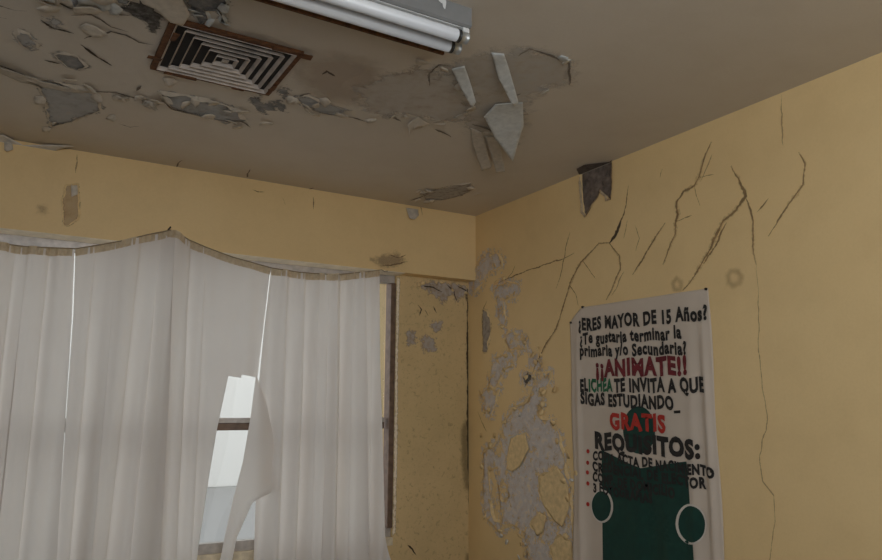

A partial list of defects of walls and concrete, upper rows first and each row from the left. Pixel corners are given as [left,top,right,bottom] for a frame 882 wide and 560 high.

peeling [35,0,140,38]
peeling [184,0,231,27]
peeling [0,51,363,132]
peeling [452,66,476,108]
peeling [470,52,524,173]
peeling [61,183,81,227]
spalling [577,160,612,218]
crack [502,143,805,368]
peeling [479,308,542,420]
peeling [392,278,469,535]